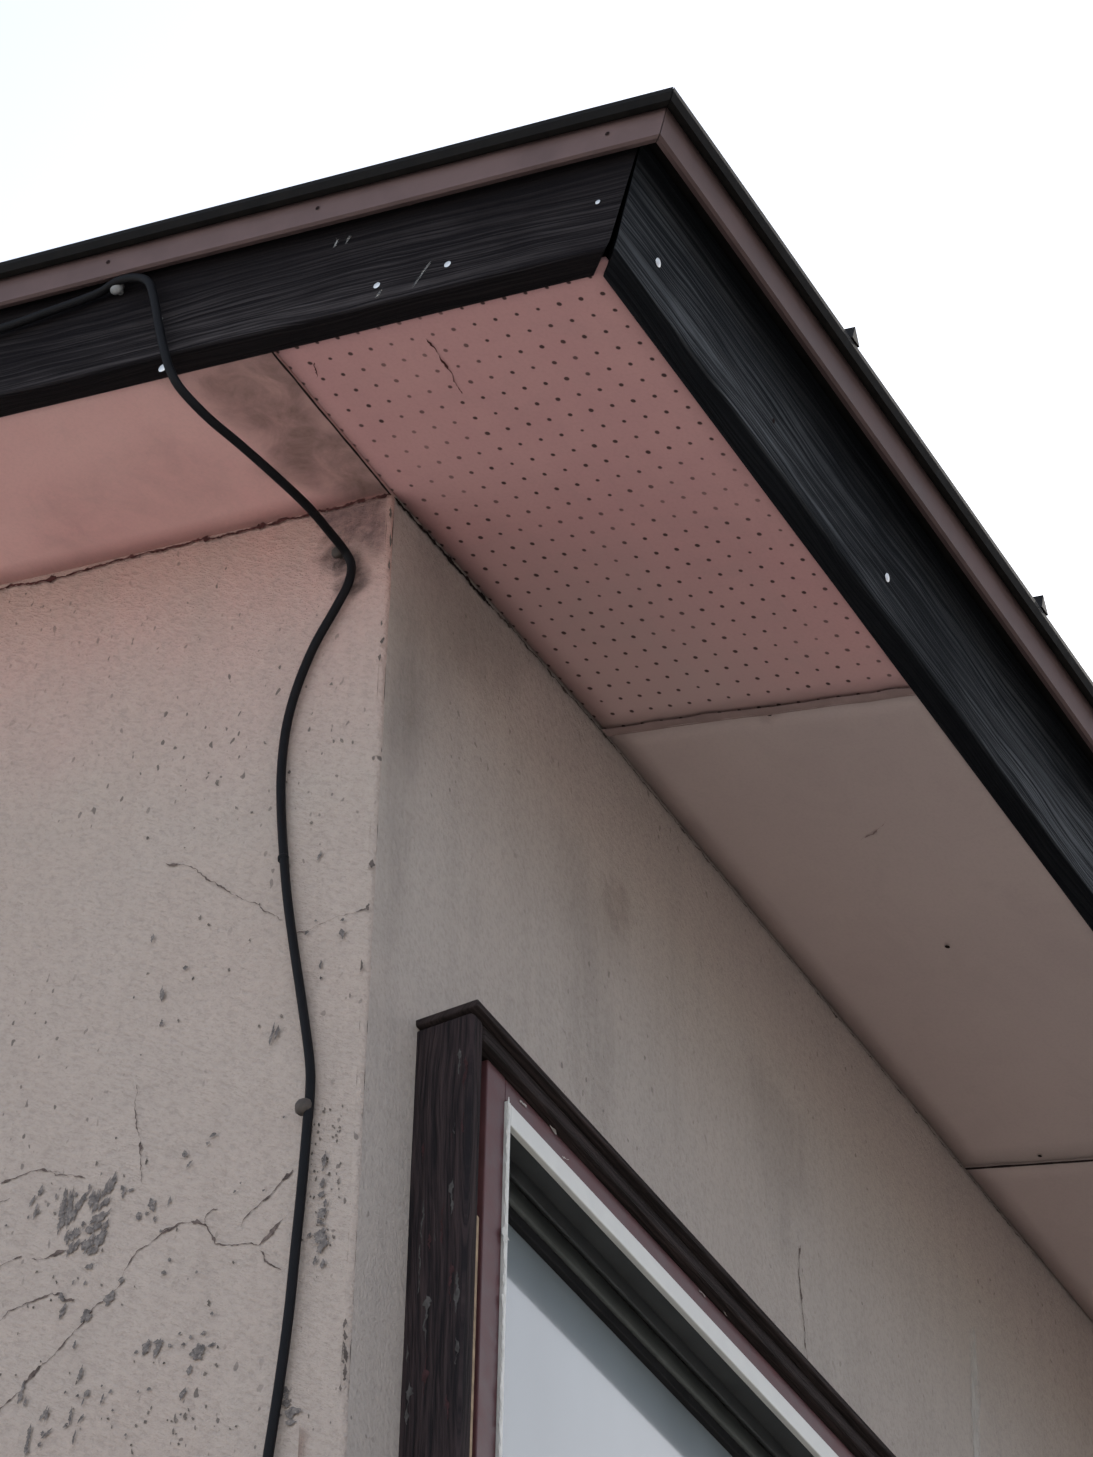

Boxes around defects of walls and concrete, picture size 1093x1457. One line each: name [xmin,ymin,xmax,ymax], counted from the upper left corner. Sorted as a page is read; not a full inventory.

peeling [27,1161,135,1323]
crack [0,1170,293,1409]
peeling [136,1196,178,1232]
peeling [24,1365,152,1455]
peeling [133,1300,219,1445]